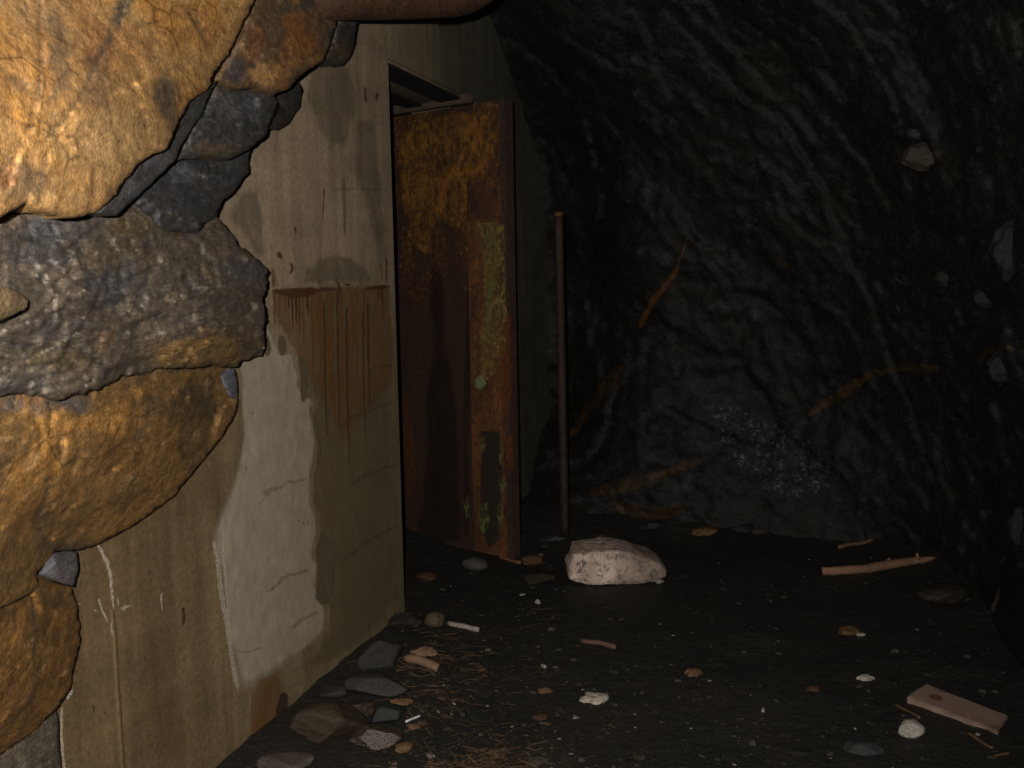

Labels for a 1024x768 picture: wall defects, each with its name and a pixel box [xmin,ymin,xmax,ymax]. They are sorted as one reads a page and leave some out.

rust [402,114,496,253]